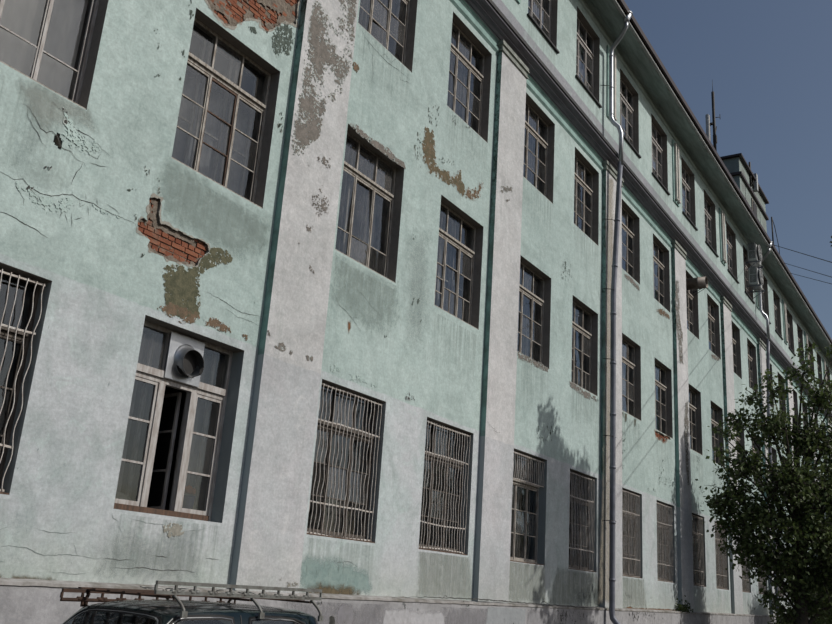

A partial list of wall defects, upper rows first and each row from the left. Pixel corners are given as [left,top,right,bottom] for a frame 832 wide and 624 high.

flaking render [205,0,300,34]
peeling [291,0,359,155]
crack [2,106,129,238]
flaking render [134,166,233,333]
peeling [312,185,329,217]
peeling [414,105,484,200]